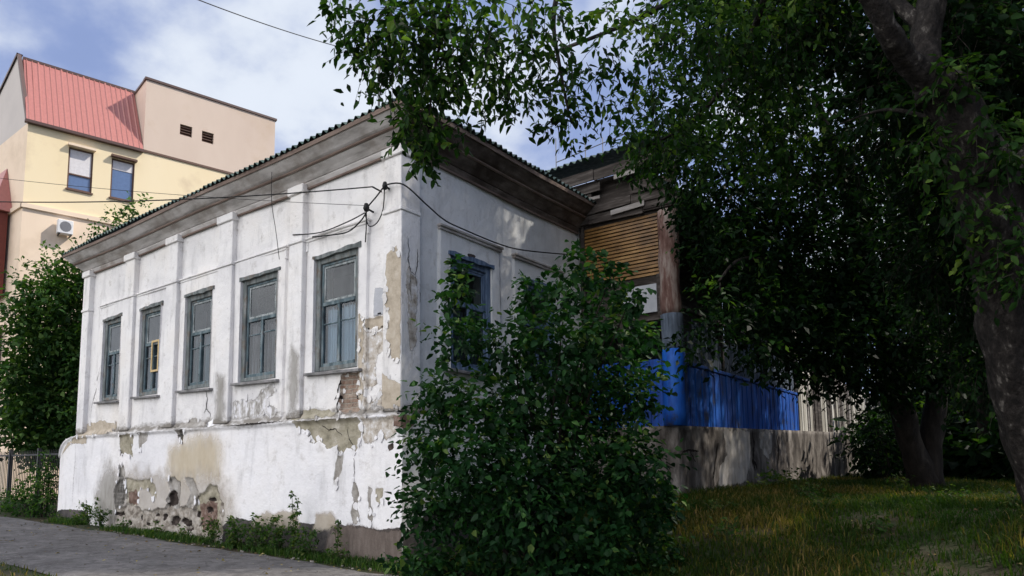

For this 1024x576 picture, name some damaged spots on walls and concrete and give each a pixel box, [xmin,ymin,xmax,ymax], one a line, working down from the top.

peeling [291,246,418,528]
spalling [62,418,224,540]
damp [95,436,228,527]